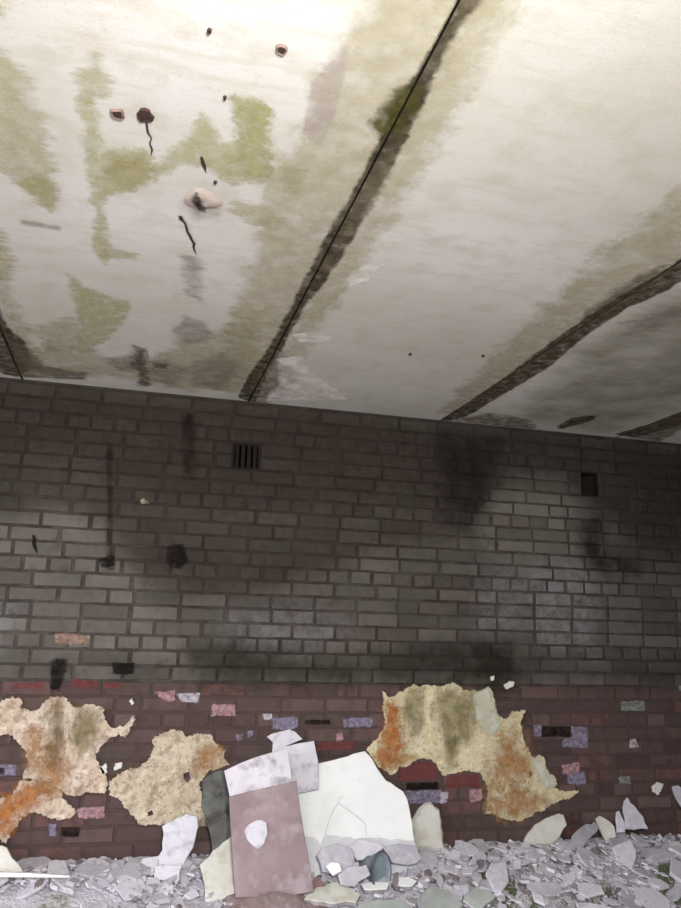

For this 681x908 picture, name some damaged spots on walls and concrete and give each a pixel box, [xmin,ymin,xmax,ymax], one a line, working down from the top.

damp [0,0,500,403]
damp [442,215,681,429]
damp [617,413,681,441]
rust [0,727,70,836]
peeling [0,682,229,844]
peeling [263,714,330,731]
peeling [317,676,588,822]
peeling [621,700,645,711]
peeling [651,782,664,795]